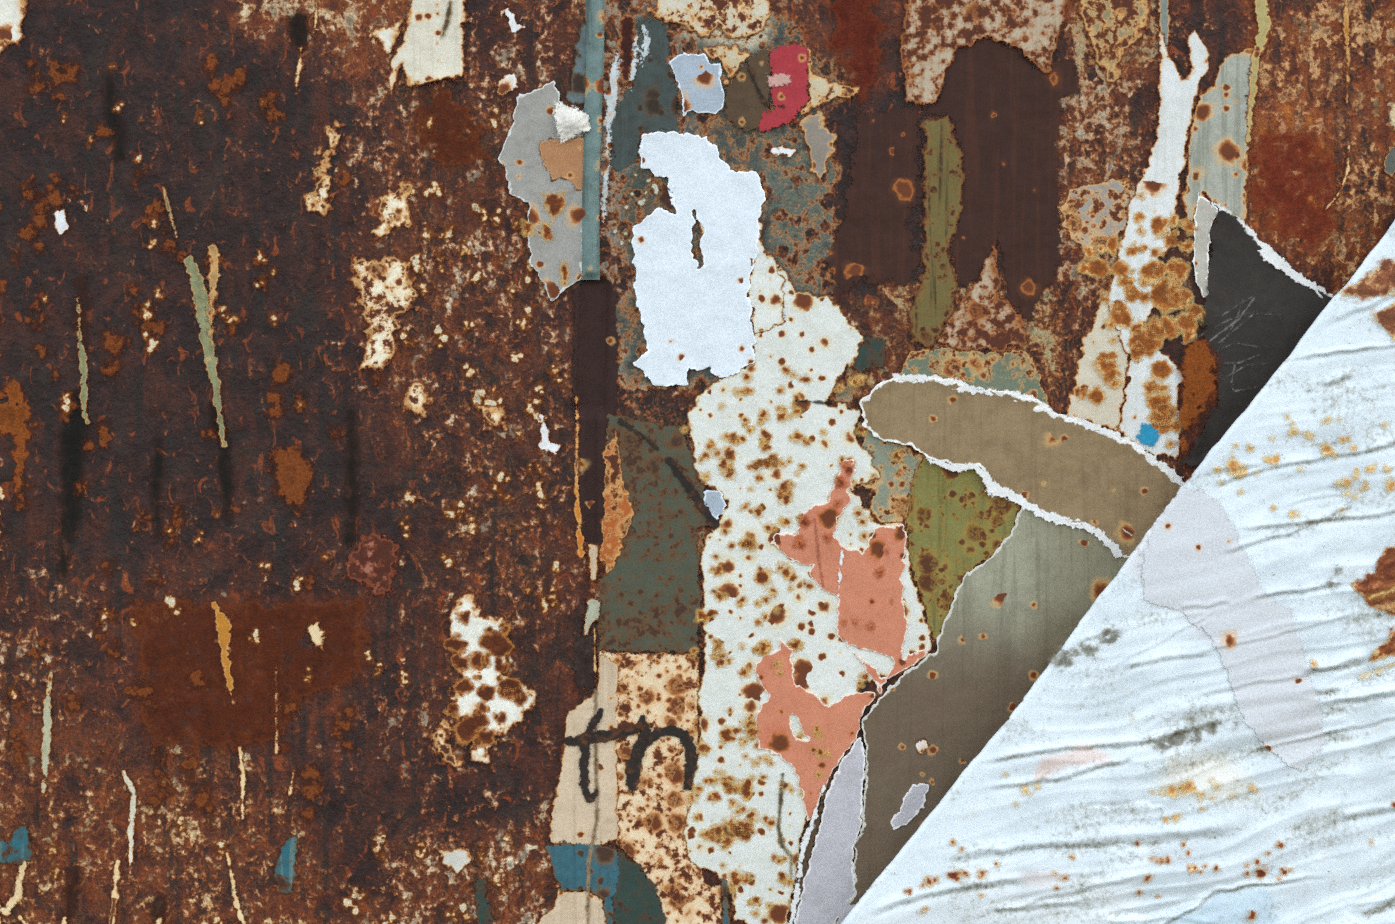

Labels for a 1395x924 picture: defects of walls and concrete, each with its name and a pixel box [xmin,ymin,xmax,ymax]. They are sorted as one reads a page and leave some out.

peeling [609,0,771,387]
peeling [770,39,861,183]
peeling [899,0,1259,460]
corrosion [1341,258,1395,343]
peeling [460,362,563,509]
corrosion [700,367,825,550]
peeling [856,427,925,526]
corrosion [94,567,371,825]
peeling [428,591,540,768]
corrosion [443,610,528,748]
corrosion [1351,546,1395,679]
corrosion [688,708,803,924]